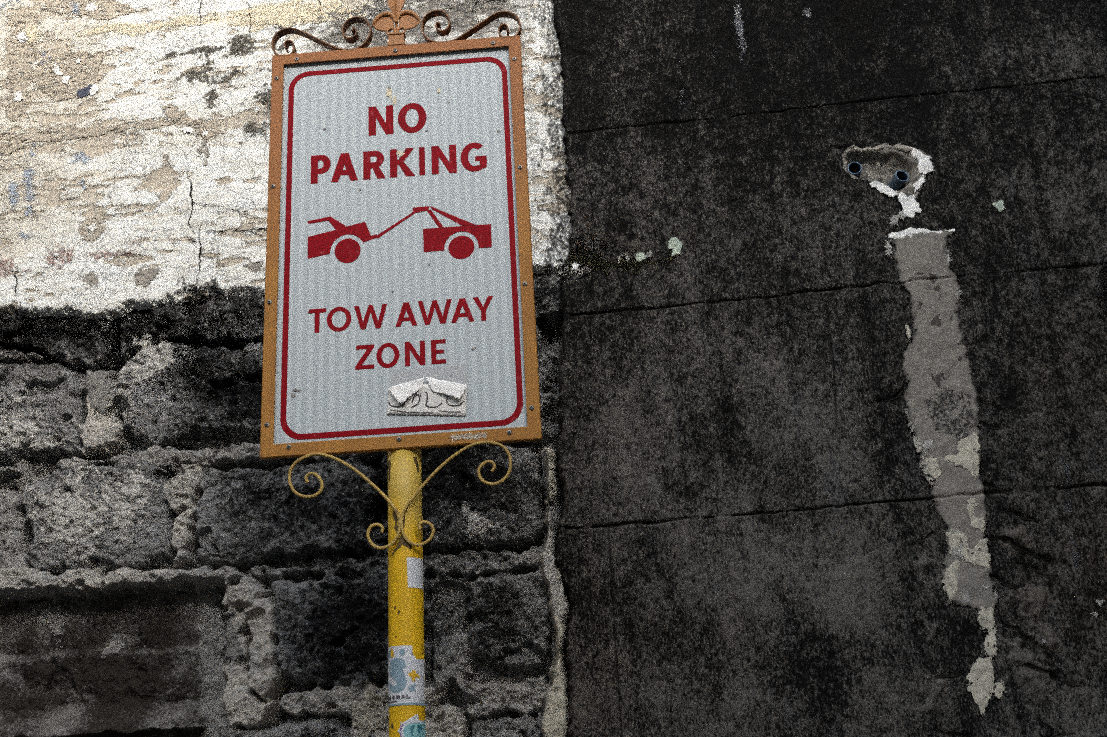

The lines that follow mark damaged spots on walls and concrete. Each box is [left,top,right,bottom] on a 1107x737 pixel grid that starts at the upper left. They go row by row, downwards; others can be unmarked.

peeling [0,0,224,165]
spalling [842,143,934,198]
peeling [77,212,107,241]
peeling [77,271,99,286]
peeling [134,266,159,287]
peeling [243,257,263,272]
peeling [905,409,980,485]
peeling [941,498,1007,715]